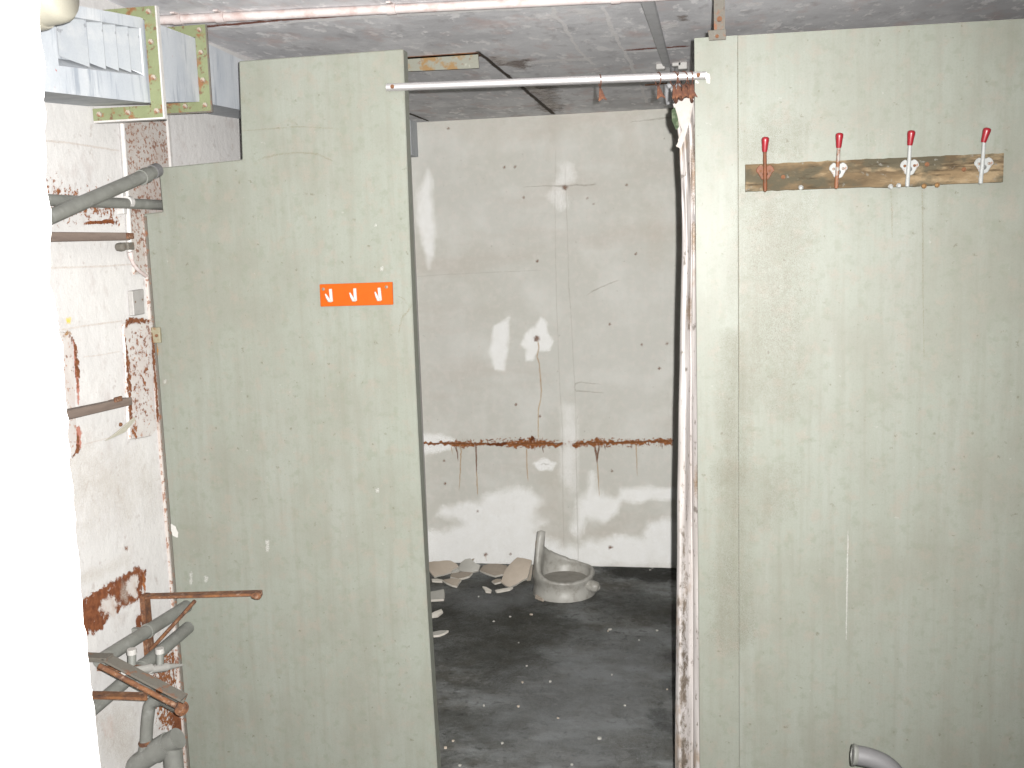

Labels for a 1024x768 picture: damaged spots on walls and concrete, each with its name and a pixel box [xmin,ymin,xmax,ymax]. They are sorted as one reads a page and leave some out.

rust [46,171,109,195]
rust [56,207,120,226]
flaking render [413,169,438,269]
rust [124,317,159,439]
flaking render [488,315,553,372]
rust [424,335,673,493]